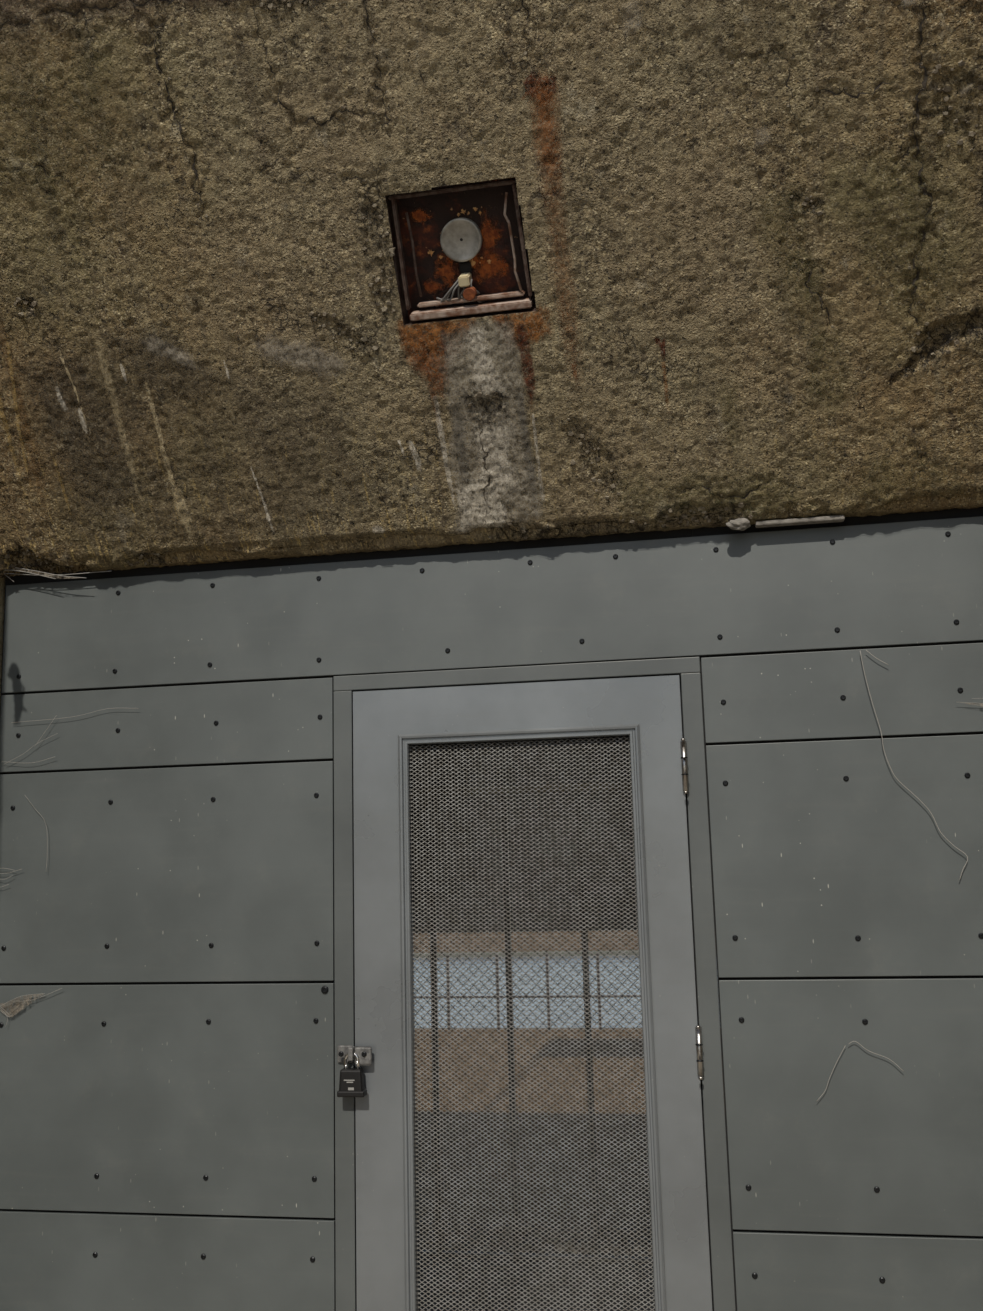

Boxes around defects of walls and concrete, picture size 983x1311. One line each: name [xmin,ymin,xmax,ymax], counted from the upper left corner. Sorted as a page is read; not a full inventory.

crack [521,0,532,57]
crack [0,0,208,220]
crack [221,0,391,170]
rust [524,72,557,172]
rust [423,207,509,293]
rust [399,320,473,401]
rust [494,308,549,404]
leakage [434,322,544,533]